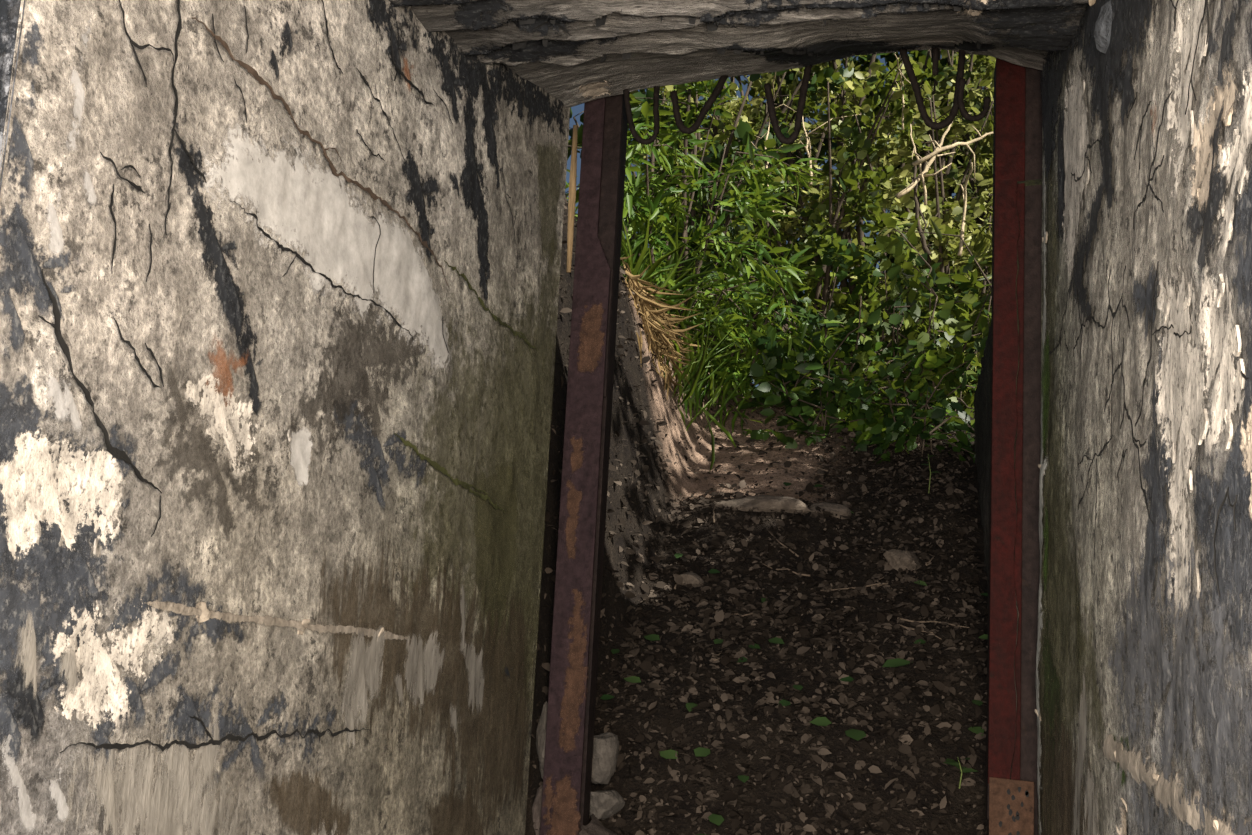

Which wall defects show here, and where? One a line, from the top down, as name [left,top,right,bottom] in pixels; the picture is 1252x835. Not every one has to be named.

peeling [0,430,122,559]
peeling [52,599,174,733]
crack [59,716,369,753]
leakage [0,368,445,835]
crack [100,0,538,356]
corrosion [543,775,581,835]
corrosion [559,589,588,751]
corrosion [565,437,584,559]
leakage [1057,53,1134,333]
crack [1048,261,1192,557]
leakage [1108,162,1252,835]
peeling [1155,0,1252,623]